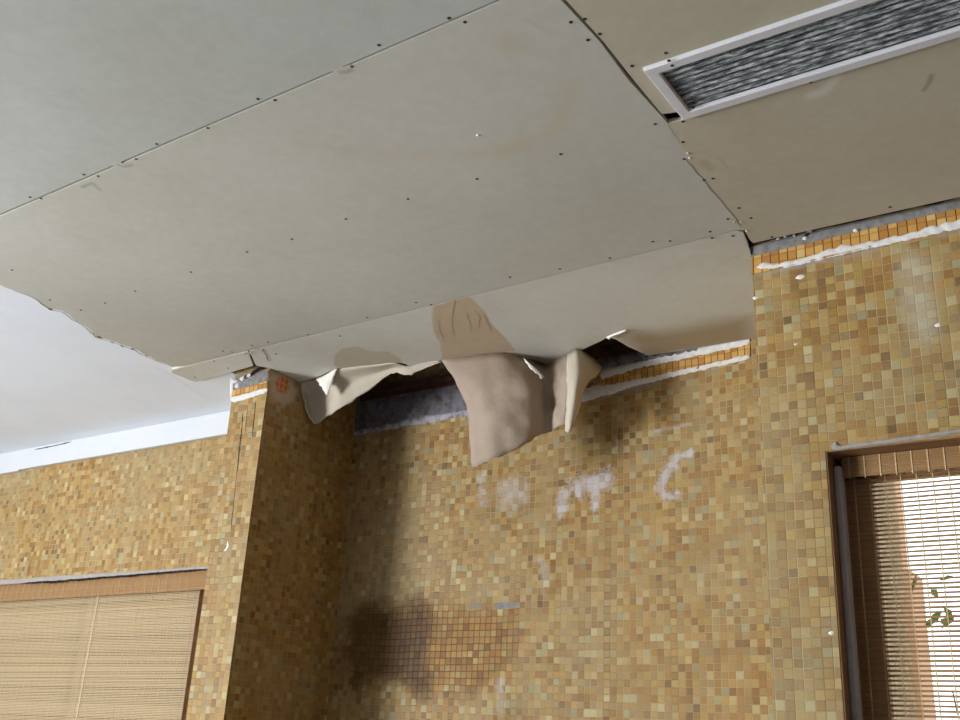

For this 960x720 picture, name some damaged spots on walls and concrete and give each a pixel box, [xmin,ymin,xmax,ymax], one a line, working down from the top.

spalling [25,294,168,366]
peeling [329,345,407,369]
peeling [427,296,520,360]
water stain [470,437,626,528]
water stain [649,444,699,509]
water stain [328,546,559,720]